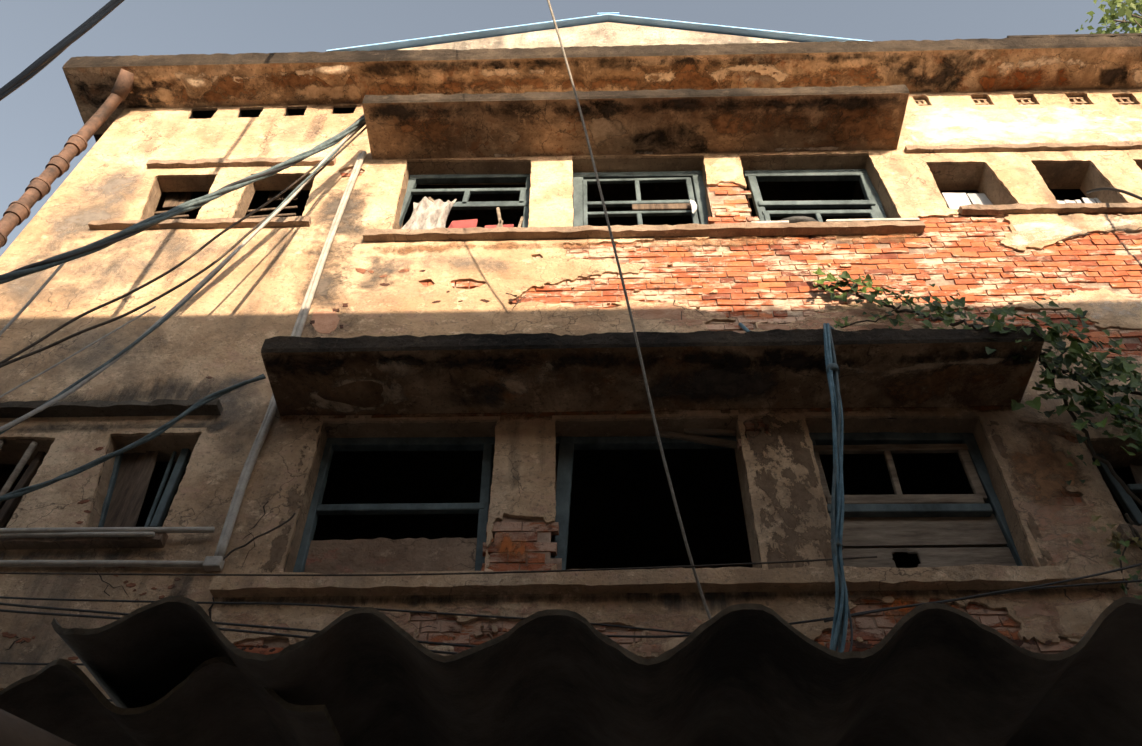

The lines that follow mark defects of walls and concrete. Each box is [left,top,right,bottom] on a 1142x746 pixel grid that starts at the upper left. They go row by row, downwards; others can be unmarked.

water stain [131,66,361,107]
water stain [369,63,897,181]
peeling [905,107,1142,144]
water stain [53,172,139,241]
water stain [8,273,41,297]
water stain [303,190,365,306]
spalling [432,281,489,303]
spalling [509,181,1142,363]
water stain [265,353,664,412]
peeling [737,415,833,569]
spalling [481,504,562,573]
spalling [814,590,1077,654]